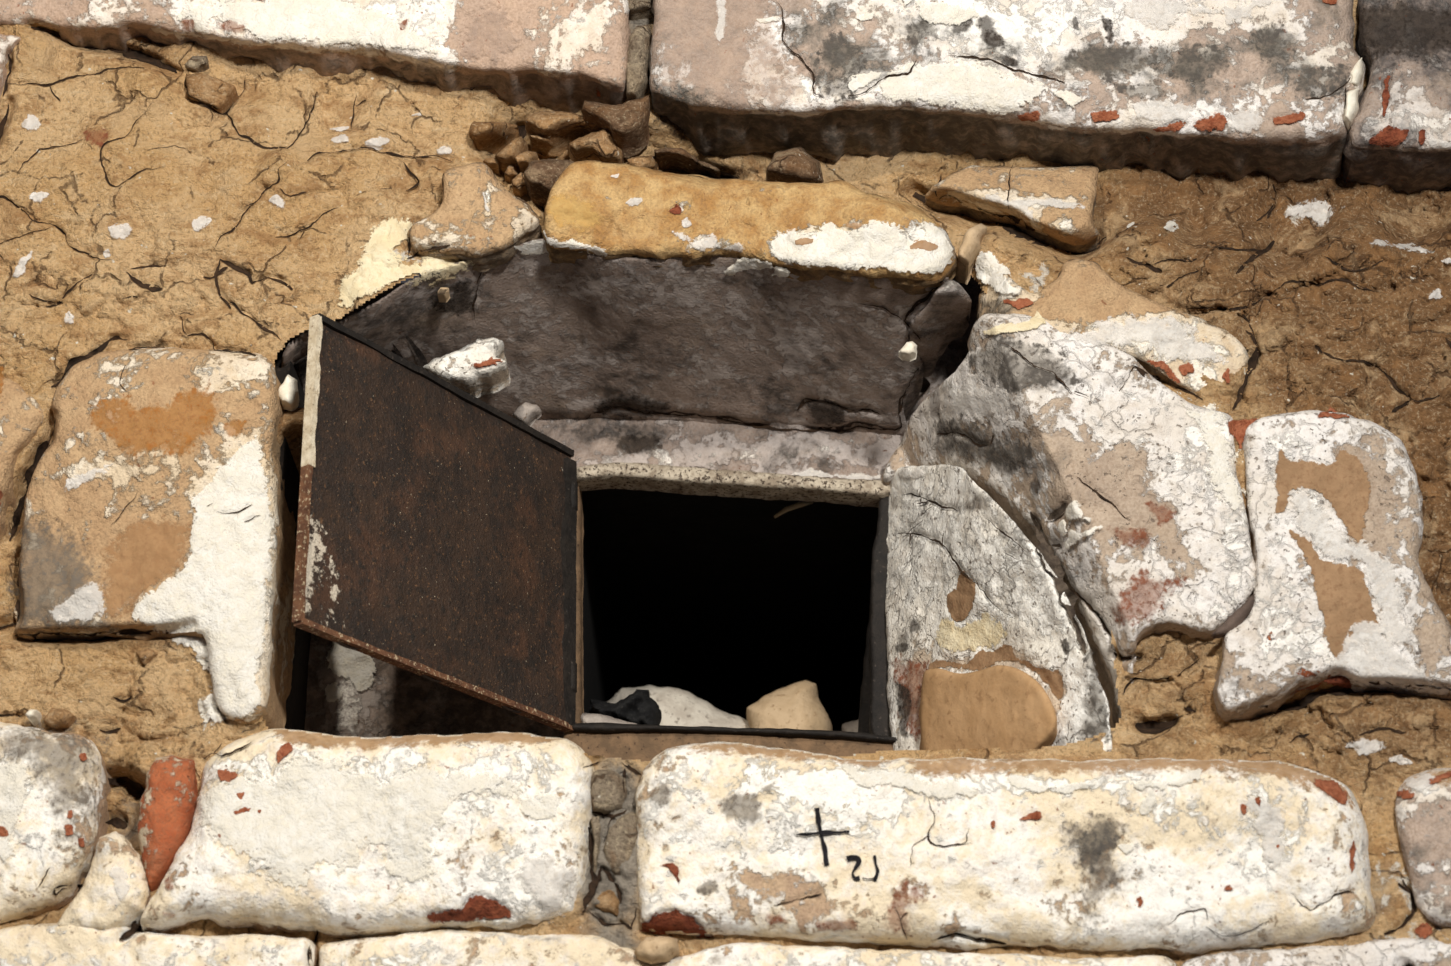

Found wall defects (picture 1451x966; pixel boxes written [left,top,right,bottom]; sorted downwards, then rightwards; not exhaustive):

crack [8,66,139,101]
crack [777,2,916,98]
crack [950,55,1065,83]
crack [0,74,453,389]
crack [1003,184,1387,409]
peeling [50,435,275,726]
corrosion [292,465,313,623]
peeling [324,642,376,702]
peeling [947,571,976,622]
peeling [928,644,1064,710]
crack [898,477,1199,694]
peeling [1275,449,1433,689]